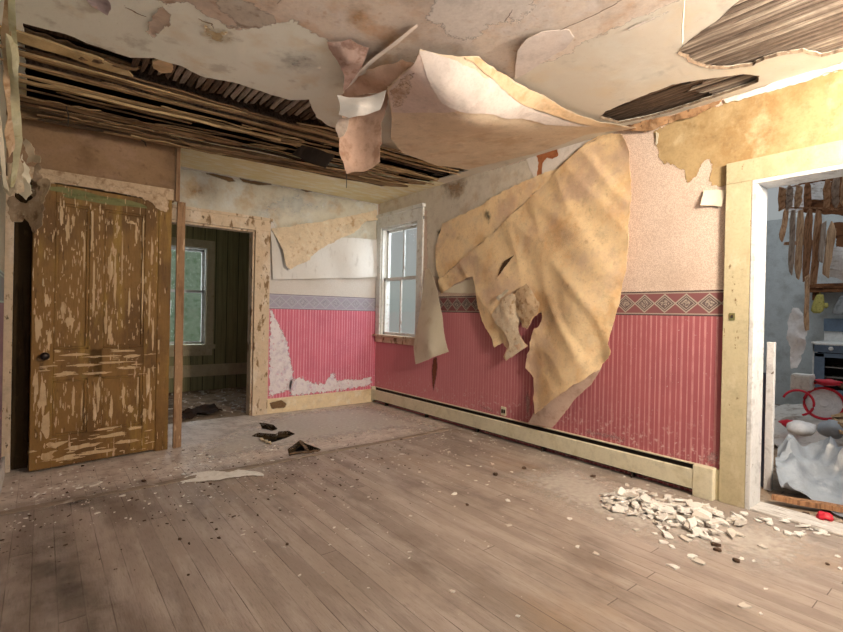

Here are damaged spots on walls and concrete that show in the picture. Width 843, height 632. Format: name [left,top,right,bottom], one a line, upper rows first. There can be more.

peeling [87,0,111,15]
peeling [515,29,574,79]
spalling [599,0,843,132]
peeling [206,173,271,185]
peeling [526,139,592,177]
peeling [28,173,169,463]
peeling [269,310,372,409]